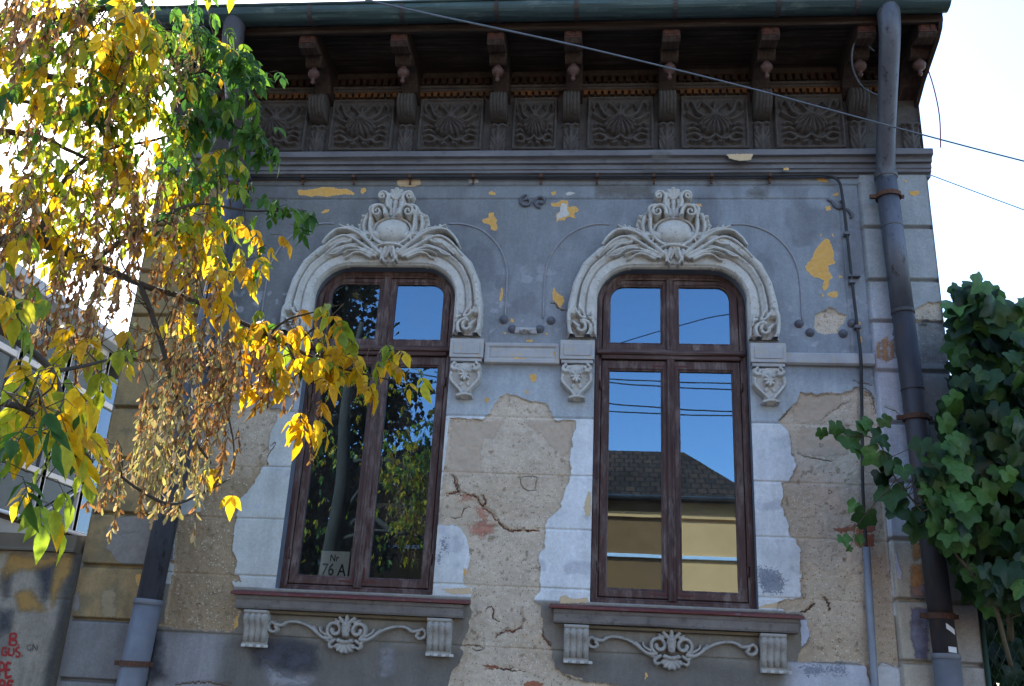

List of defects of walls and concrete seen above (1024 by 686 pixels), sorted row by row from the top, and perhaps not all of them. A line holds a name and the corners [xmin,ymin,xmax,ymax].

peeling [727,153,753,161]
peeling [297,187,366,213]
peeling [482,212,497,231]
peeling [551,191,579,222]
peeling [805,234,863,342]
spalling [915,301,946,365]
spalling [159,399,284,633]
crack [446,475,540,533]
spalling [436,374,618,686]
spalling [759,388,902,684]
crack [462,606,551,672]